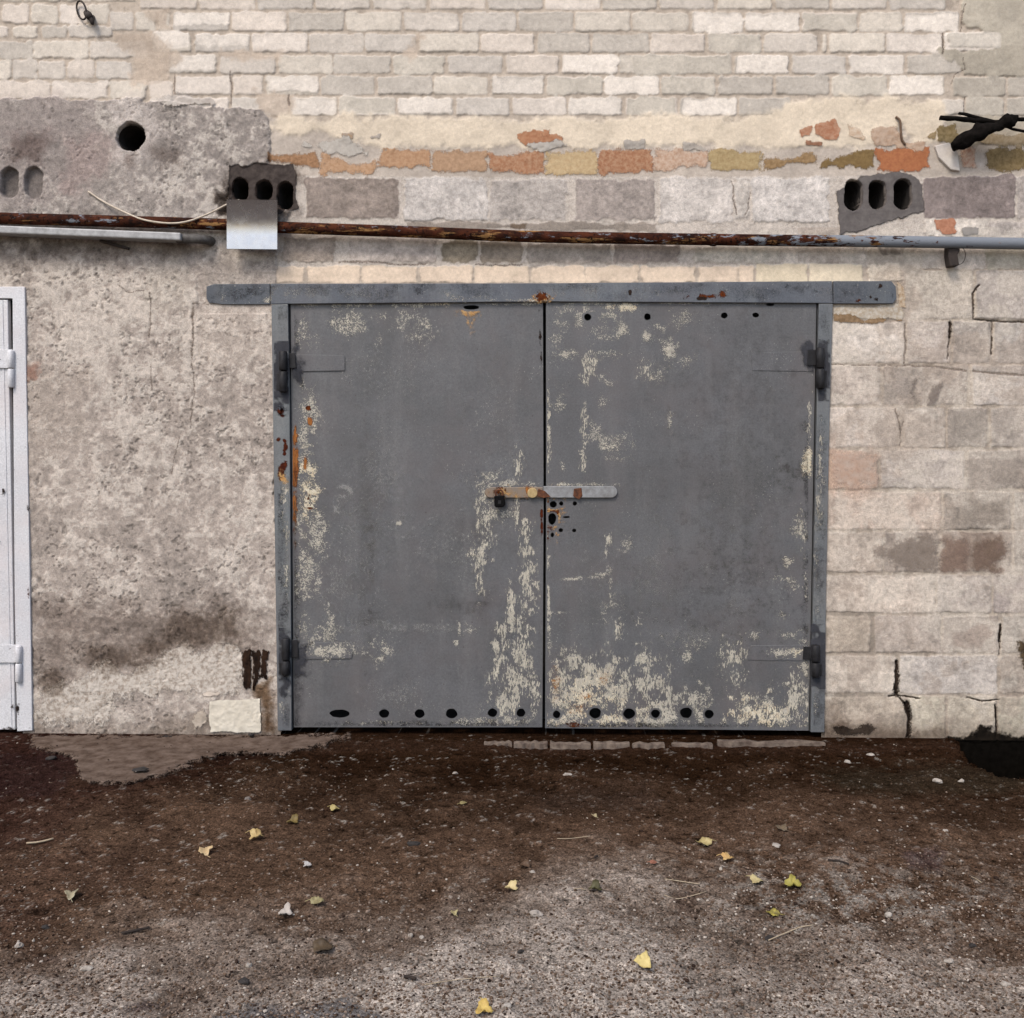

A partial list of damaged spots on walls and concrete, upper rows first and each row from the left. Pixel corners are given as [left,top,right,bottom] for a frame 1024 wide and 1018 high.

peeling [267,118,1024,178]
rust [686,291,726,300]
crack [832,284,1024,376]
rust [276,427,313,522]
rust [540,498,563,539]
peeling [440,387,715,727]
peeling [707,628,818,727]
crack [888,660,920,738]